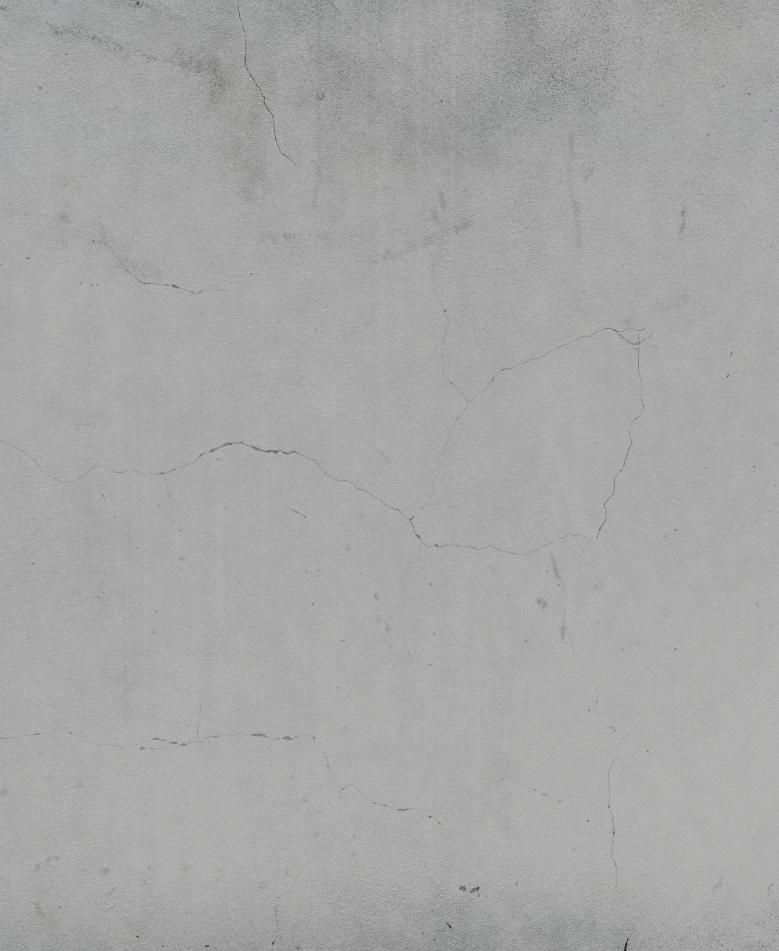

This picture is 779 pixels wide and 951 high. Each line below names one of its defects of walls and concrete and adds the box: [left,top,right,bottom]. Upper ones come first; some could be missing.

crack [66,442,443,555]
crack [118,705,441,824]